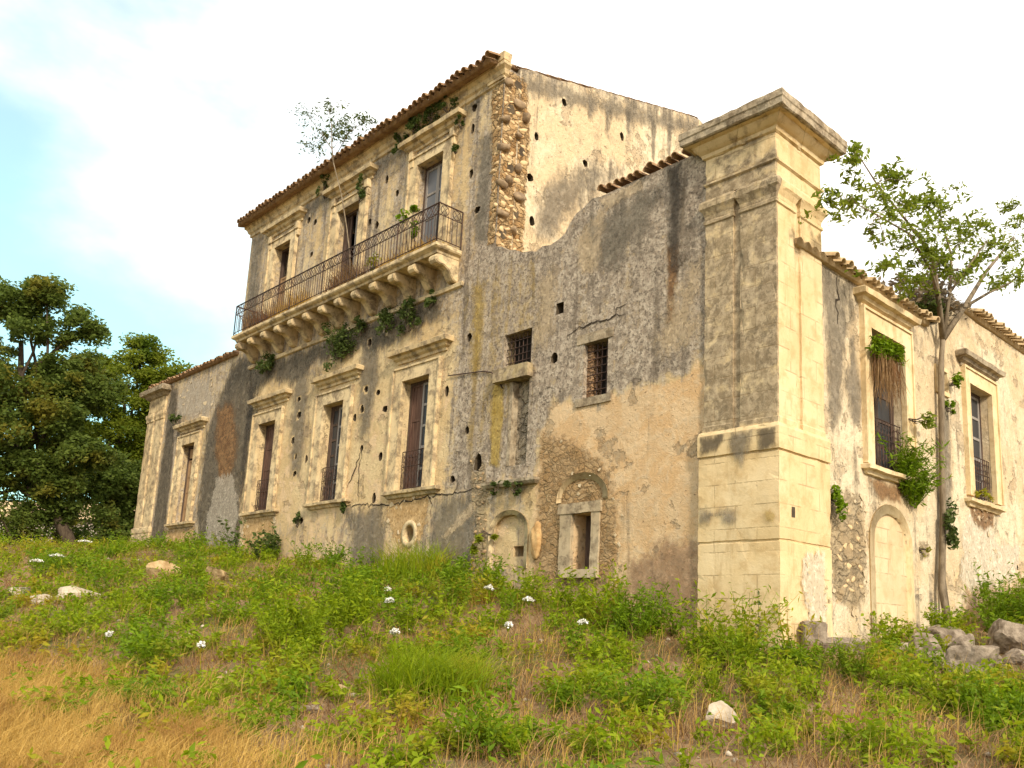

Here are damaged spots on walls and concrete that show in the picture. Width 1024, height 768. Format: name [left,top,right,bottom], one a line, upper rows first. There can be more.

spalling [474,71,538,252]
water stain [536,160,618,240]
water stain [524,78,696,158]
water stain [668,164,681,271]
crack [567,303,627,336]
water stain [822,268,861,426]
water stain [197,298,441,550]
crack [347,451,481,514]
spalling [535,430,623,592]
spalling [802,490,868,622]